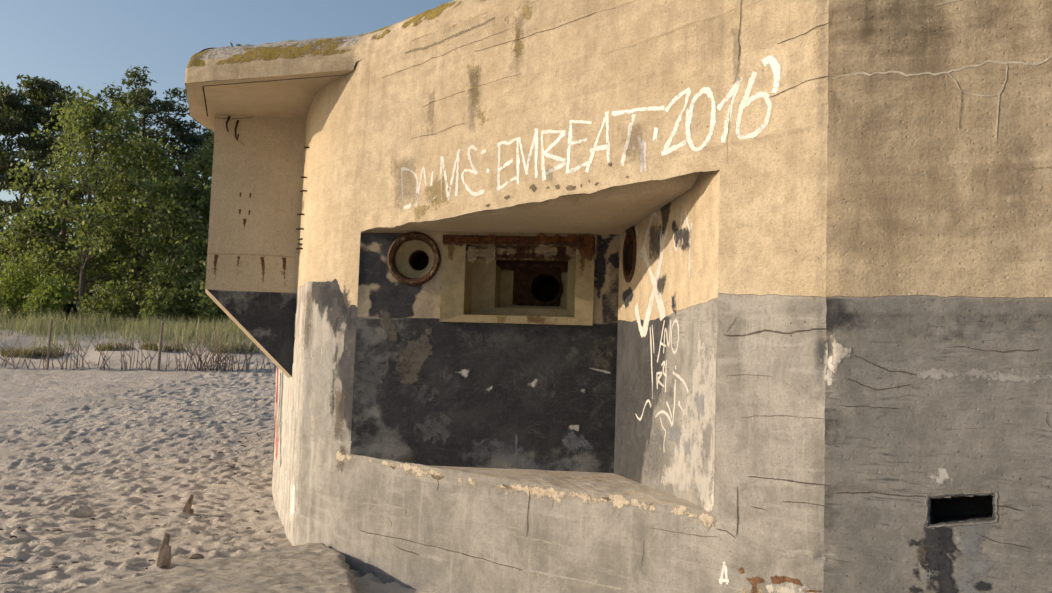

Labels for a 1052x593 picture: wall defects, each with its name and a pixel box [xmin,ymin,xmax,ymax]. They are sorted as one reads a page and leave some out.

crack [382,0,635,78]
crack [738,0,760,62]
crack [778,23,828,44]
crack [768,55,1052,141]
corrosion [444,233,595,275]
peeling [594,225,635,298]
peeling [649,202,691,258]
peeling [657,276,676,317]
spalling [820,334,852,385]
peeling [310,334,444,480]
spalling [497,483,656,513]
peeling [909,523,962,593]